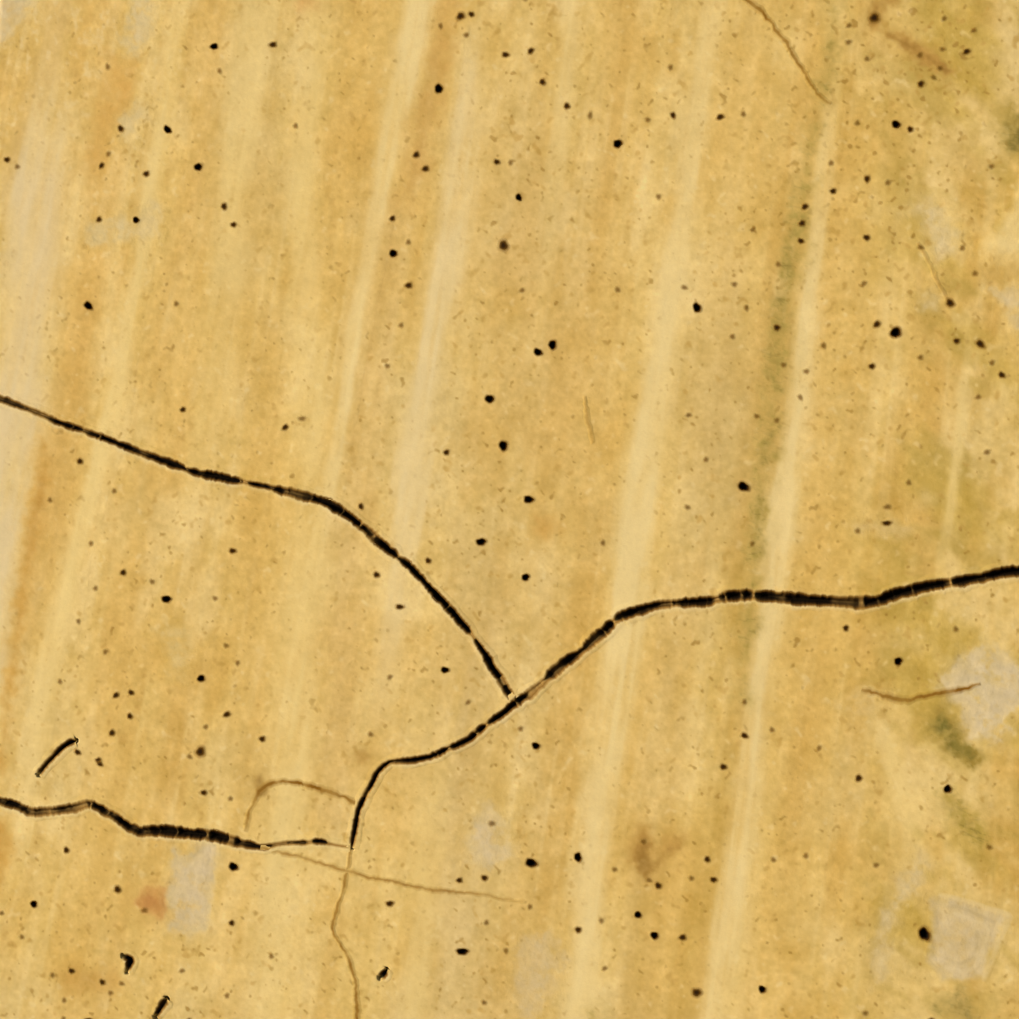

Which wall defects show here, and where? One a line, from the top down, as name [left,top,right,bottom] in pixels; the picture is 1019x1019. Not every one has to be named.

crack [740,0,832,106]
crack [0,389,1019,1019]